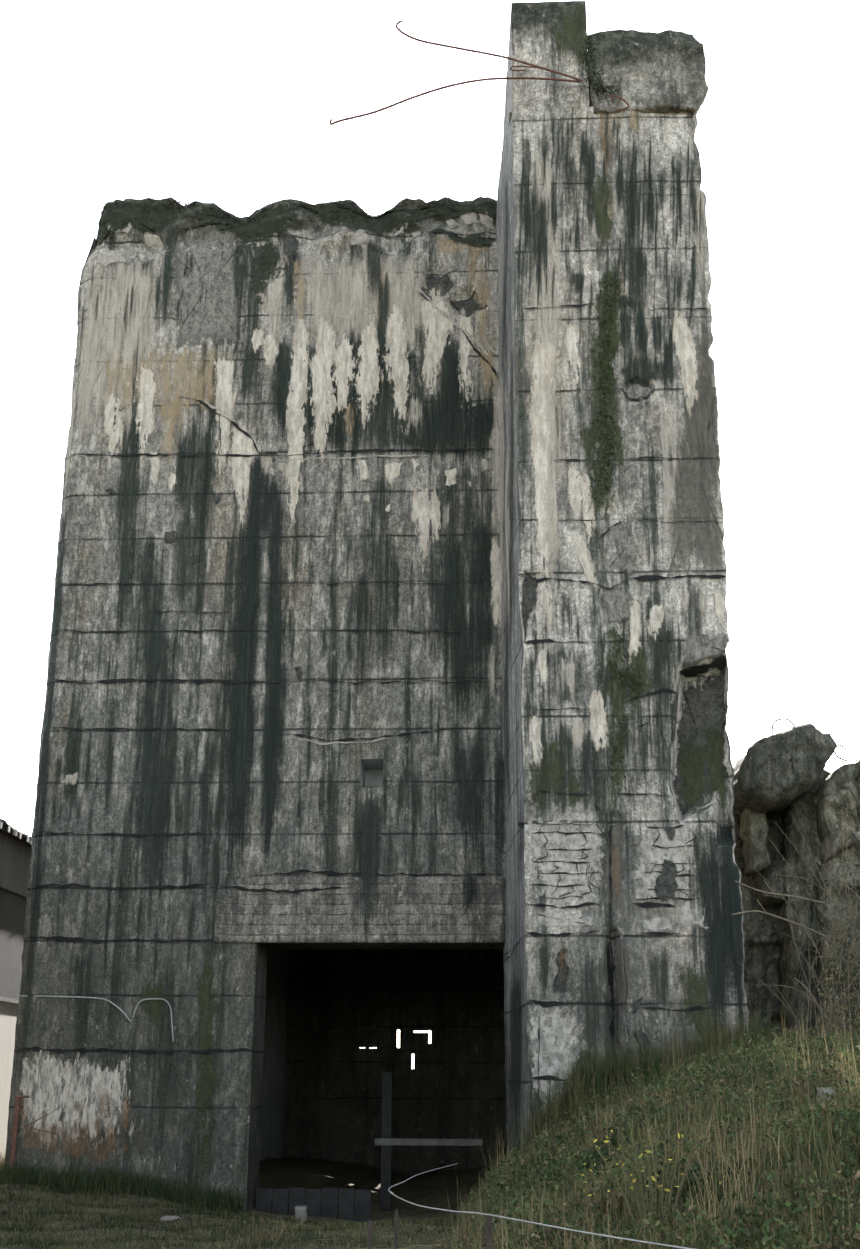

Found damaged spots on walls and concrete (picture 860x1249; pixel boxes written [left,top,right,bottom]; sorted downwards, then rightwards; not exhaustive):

spalling [96,250,126,267]
spalling [108,201,497,350]
water stain [36,108,725,1178]
crack [628,689,677,727]
spalling [632,666,728,932]
crack [503,790,710,1111]
peeling [17,1047,137,1149]